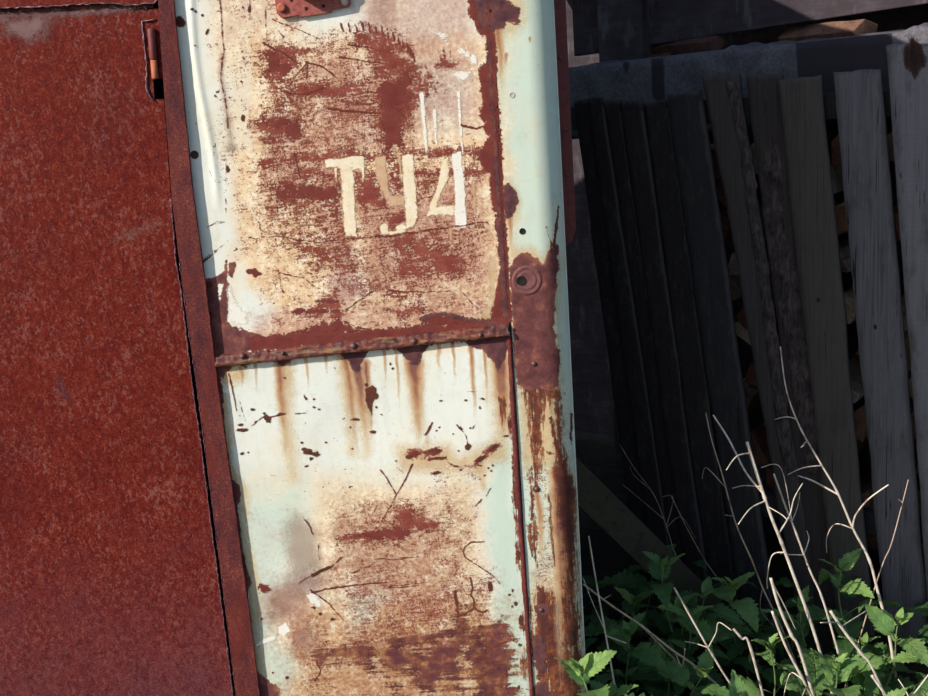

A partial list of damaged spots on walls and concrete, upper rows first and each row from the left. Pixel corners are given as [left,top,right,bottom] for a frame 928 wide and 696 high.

peeling [206,260,265,356]
corrosion [241,0,587,696]
spalling [364,383,379,426]
spalling [301,448,320,467]
peeling [404,443,503,486]
corrosion [217,363,281,696]
peeling [307,591,322,609]
peeling [256,622,290,646]